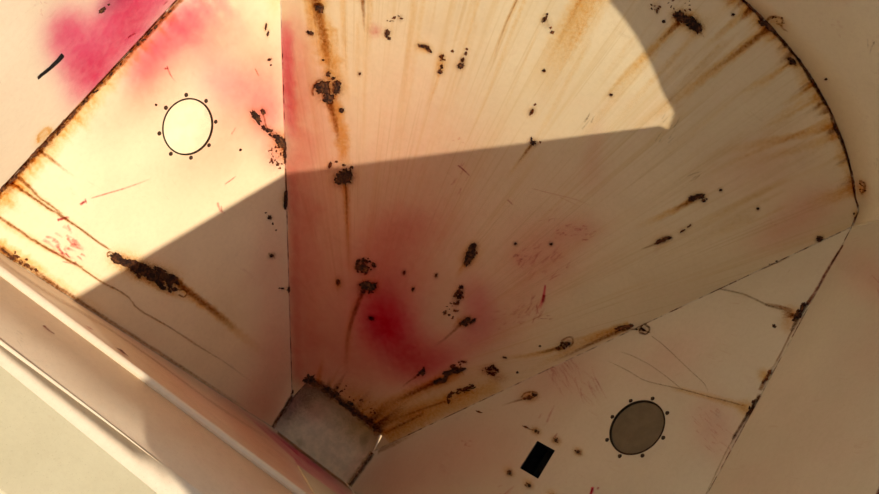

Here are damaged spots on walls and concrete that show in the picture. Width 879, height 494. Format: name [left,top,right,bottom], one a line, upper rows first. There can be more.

rust [307,0,324,36]
rust [650,0,702,35]
rust [312,71,344,122]
rust [742,0,867,194]
rust [0,0,218,314]
rust [250,109,287,169]
rust [328,161,354,186]
rust [1,248,140,341]
rust [355,258,378,296]
rust [464,242,478,267]
rust [414,361,476,404]
rust [733,370,772,437]